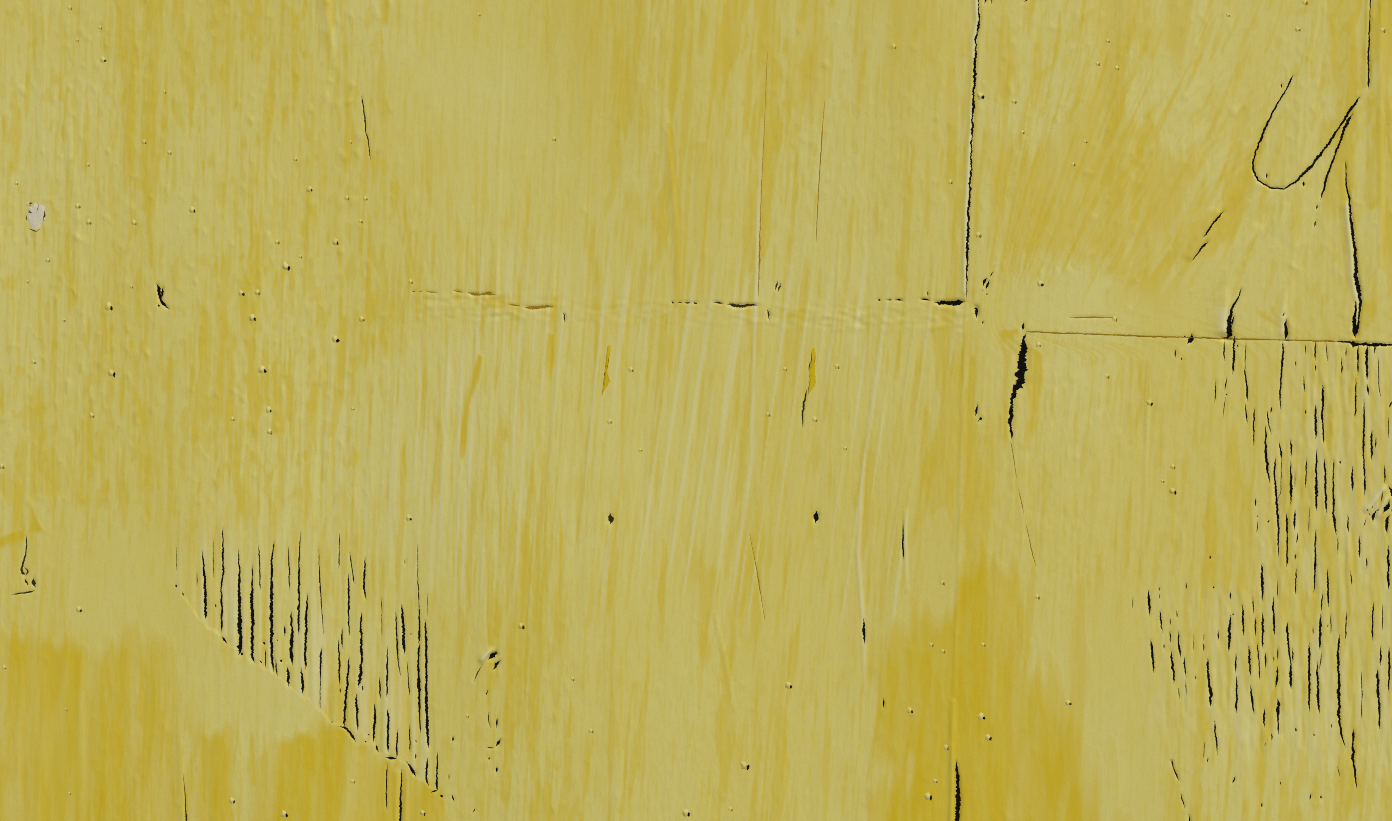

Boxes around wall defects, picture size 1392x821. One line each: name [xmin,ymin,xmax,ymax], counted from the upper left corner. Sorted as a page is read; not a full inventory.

crack [878,0,1027,306]
crack [1008,161,1392,821]
crack [176,530,453,821]
crack [954,762,962,821]